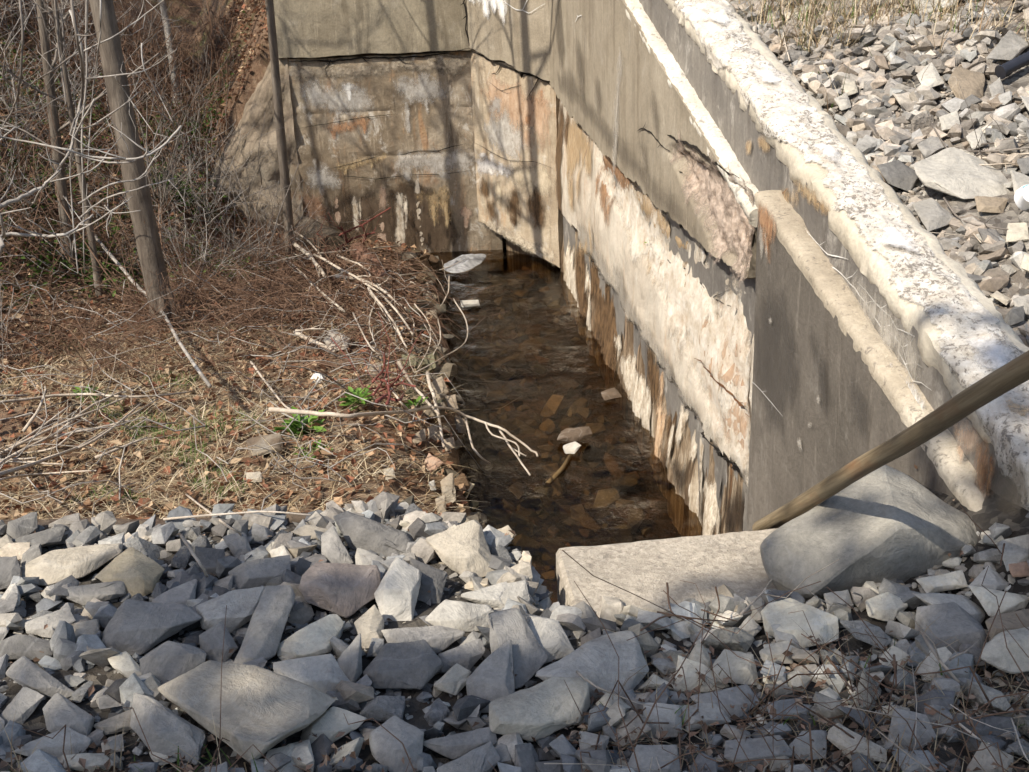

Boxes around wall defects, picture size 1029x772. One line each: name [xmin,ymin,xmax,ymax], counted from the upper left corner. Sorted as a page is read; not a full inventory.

crack [289,0,550,98]
leakage [302,80,372,122]
leakage [398,74,446,132]
leakage [485,99,527,159]
leakage [556,104,569,217]
crack [638,123,740,179]
leakage [307,150,472,253]
leakage [480,177,545,228]
rust [566,121,688,286]
rust [699,319,745,386]
rust [723,399,749,448]